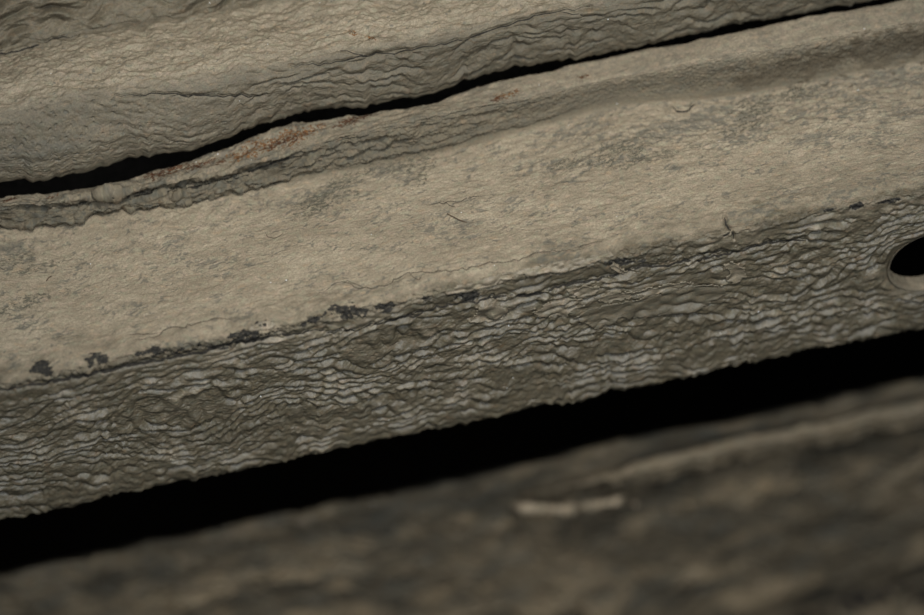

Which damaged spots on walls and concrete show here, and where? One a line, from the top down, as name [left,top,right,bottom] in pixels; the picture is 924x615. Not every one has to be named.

crack [0,0,900,204]
rust [143,115,372,181]
peeling [300,300,395,327]
peeling [196,320,276,350]
peeling [29,359,54,377]
peeling [79,352,109,368]
peeling [135,346,184,357]